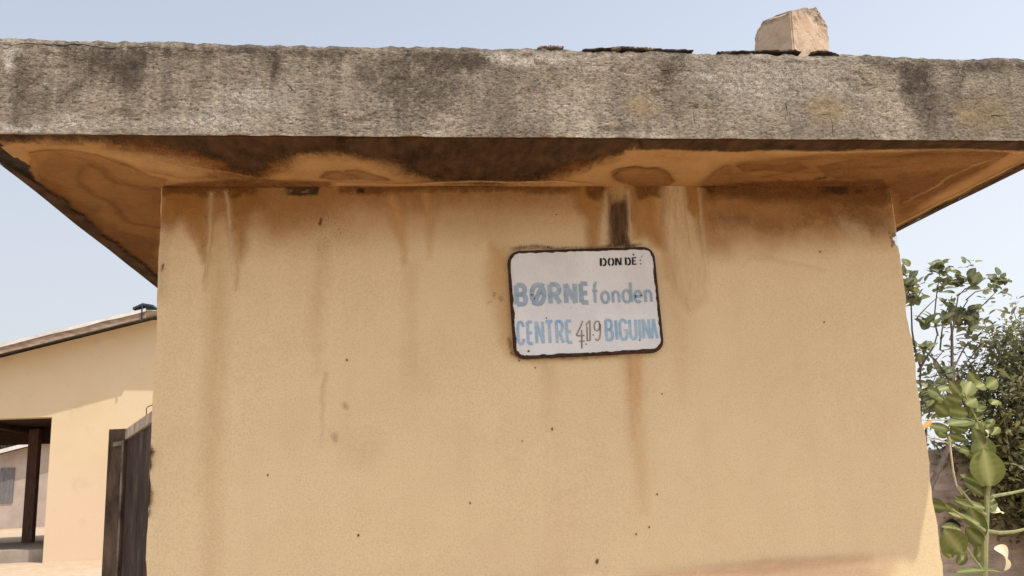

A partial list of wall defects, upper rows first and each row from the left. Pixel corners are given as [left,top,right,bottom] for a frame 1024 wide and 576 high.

damp [0,46,1024,308]